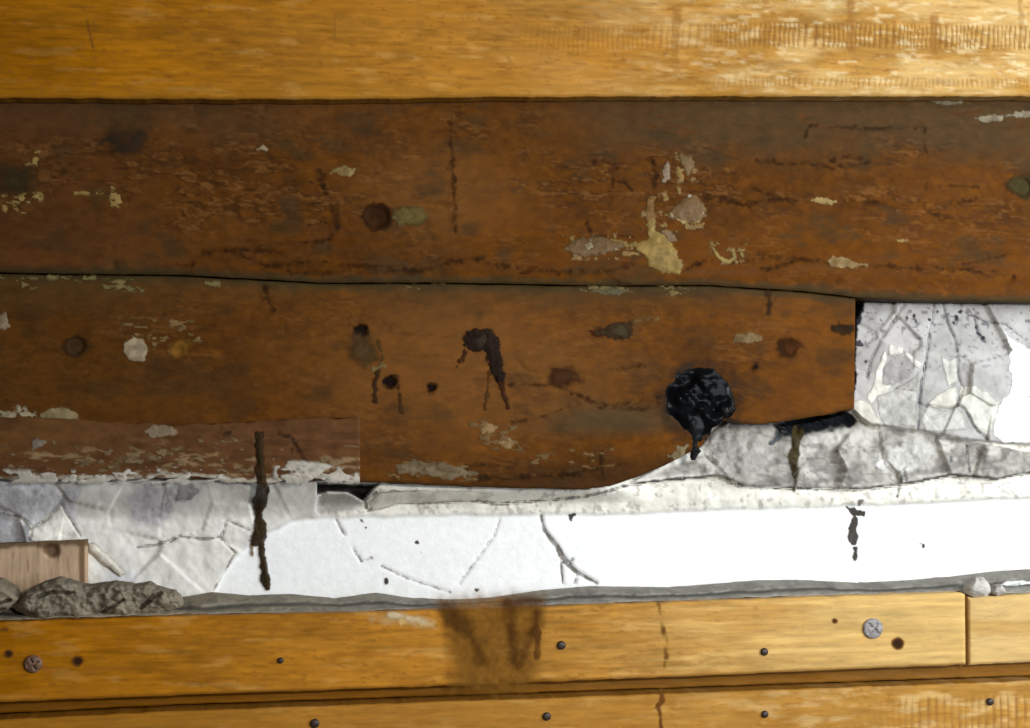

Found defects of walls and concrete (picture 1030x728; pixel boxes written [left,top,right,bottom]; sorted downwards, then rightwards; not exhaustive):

peeling [564,152,707,296]
peeling [710,241,747,264]
corrosion [457,328,510,410]
crack [0,509,81,541]
peeling [32,425,254,508]
crack [137,520,248,588]
corrosion [250,431,275,590]
peeling [273,457,359,484]
crack [336,303,1030,593]
water stain [442,596,543,688]